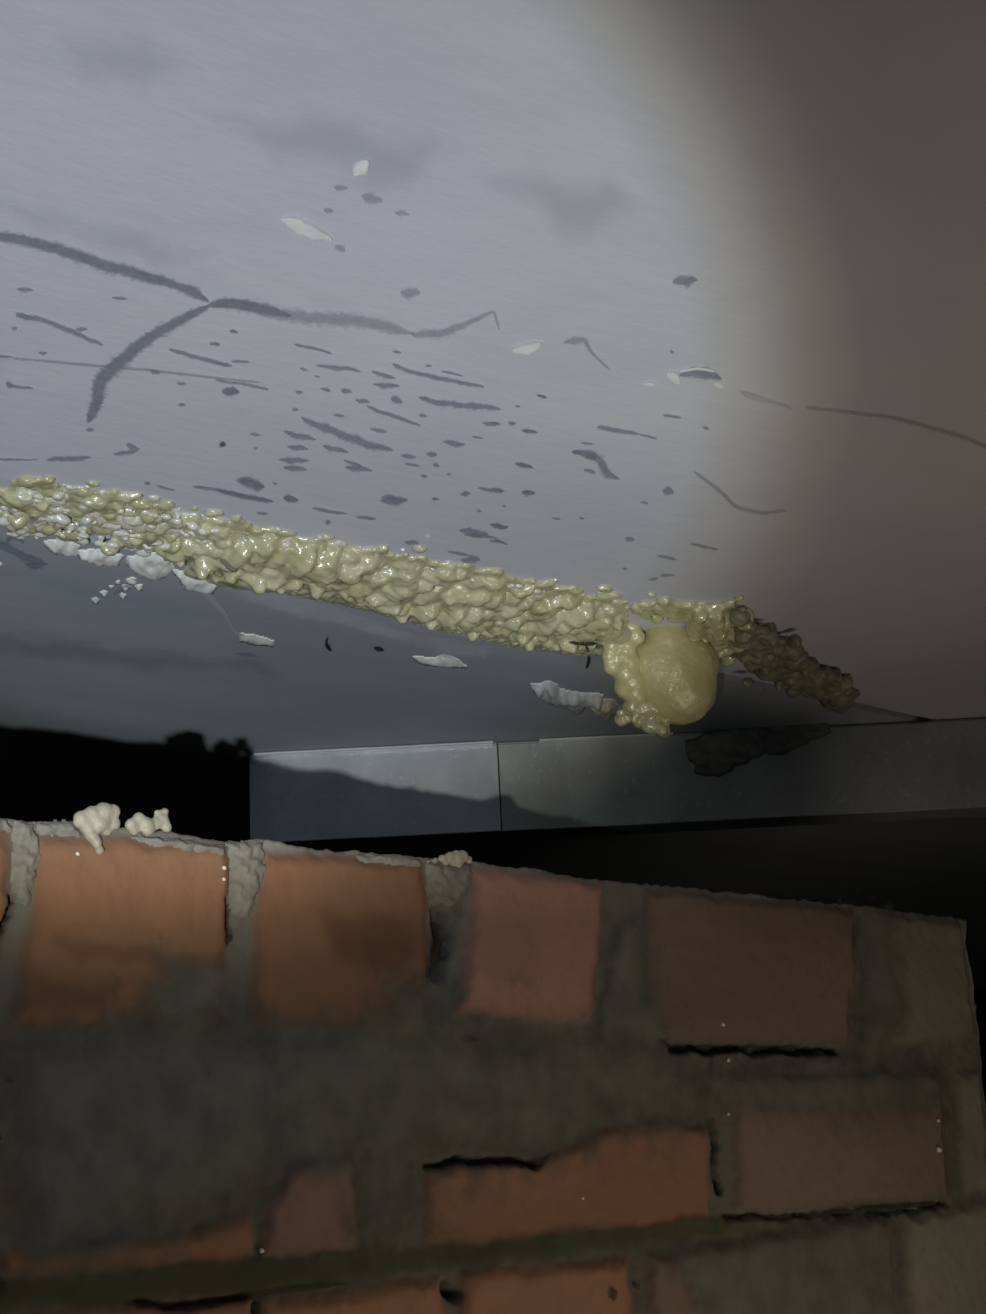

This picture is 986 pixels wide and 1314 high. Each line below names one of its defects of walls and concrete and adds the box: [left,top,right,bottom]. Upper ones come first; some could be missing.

crack [0,233,290,422]
crack [127,1283,347,1312]